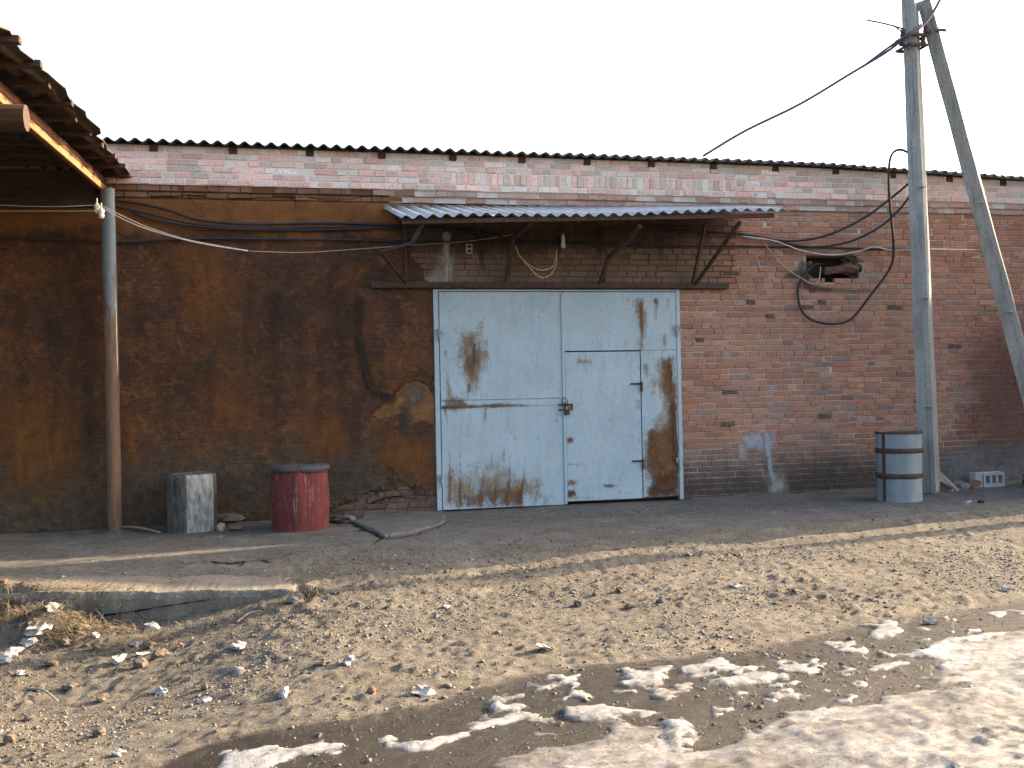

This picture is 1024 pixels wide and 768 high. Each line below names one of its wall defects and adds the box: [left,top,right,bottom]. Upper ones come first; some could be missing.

spalling [802,256,863,309]
corrosion [442,325,536,418]
peeling [372,379,435,434]
corrosion [645,359,679,497]
peeling [329,475,435,516]
corrosion [448,465,546,508]
leakage [686,433,849,496]